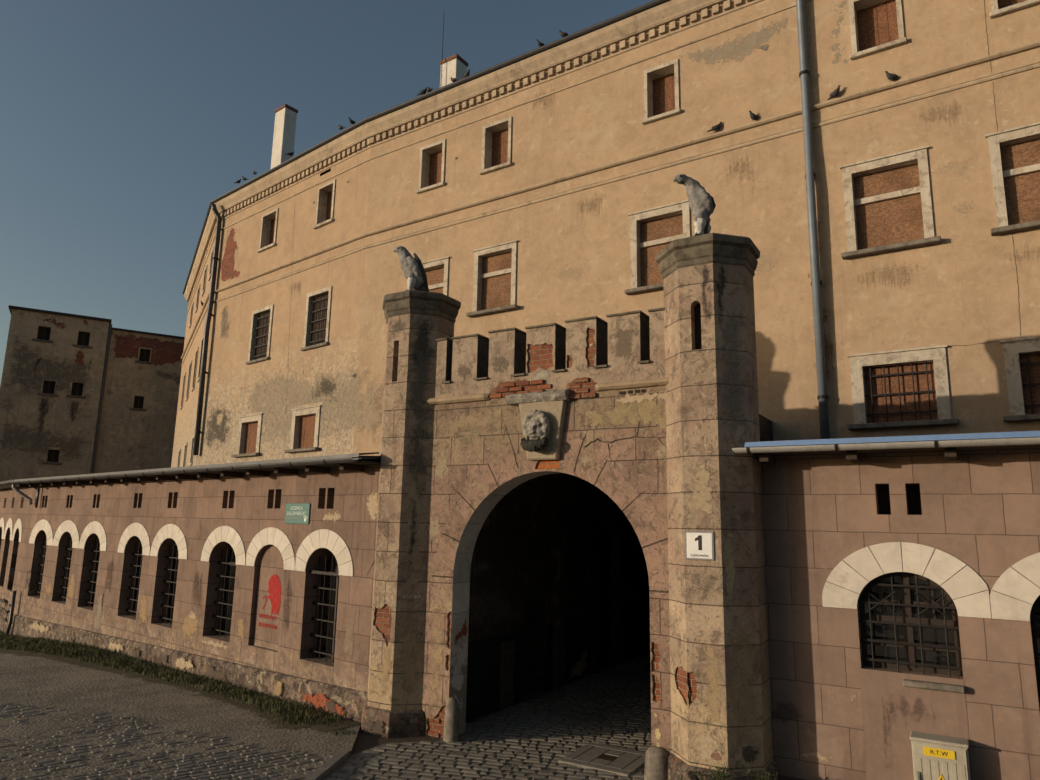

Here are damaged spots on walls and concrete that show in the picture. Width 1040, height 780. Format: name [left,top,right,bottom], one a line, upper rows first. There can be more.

flaking render [220,228,240,282]
damp [0,341,88,460]
flaking render [113,333,184,366]
damp [206,409,230,447]
damp [408,324,435,476]
flaking render [489,343,554,399]
peeling [567,328,667,462]
crack [573,411,667,473]
flaking render [374,604,392,645]
flaking render [302,692,345,716]
peeling [428,606,468,738]
flaking render [677,667,697,704]